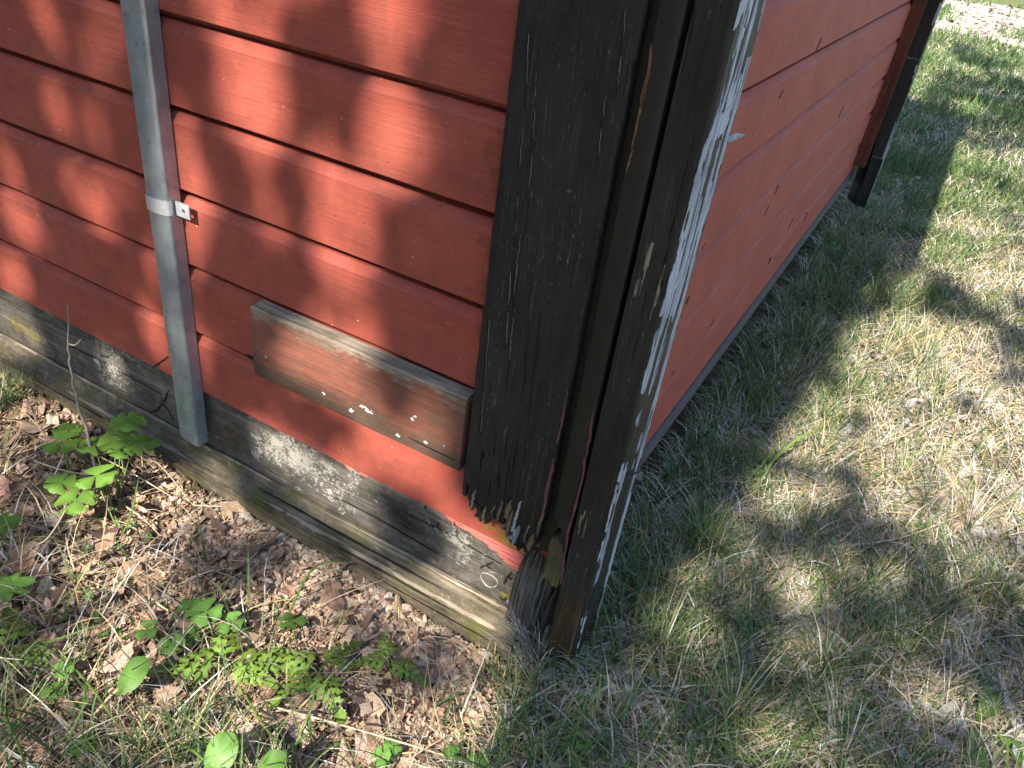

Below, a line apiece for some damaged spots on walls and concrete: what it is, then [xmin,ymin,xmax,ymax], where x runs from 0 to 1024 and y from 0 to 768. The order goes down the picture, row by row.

damp [0,334,180,431]
peeling [576,0,766,656]
damp [263,500,508,631]
peeling [445,515,525,571]